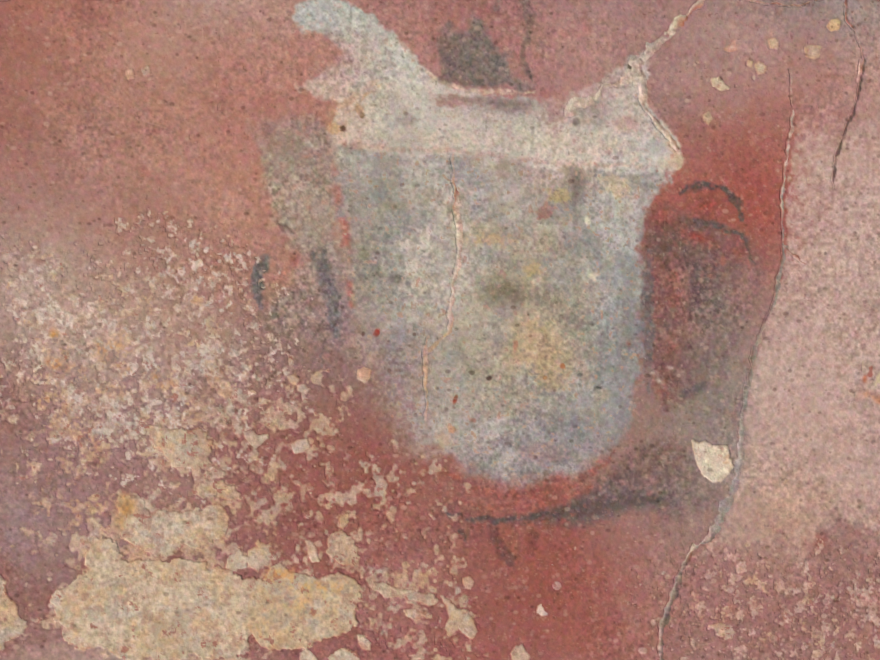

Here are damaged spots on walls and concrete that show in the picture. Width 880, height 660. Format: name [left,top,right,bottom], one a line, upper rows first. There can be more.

crack [563,0,706,152]
crack [831,0,867,189]
damp [0,231,257,408]
peeling [0,201,497,660]
flaking render [687,439,734,483]
crack [657,68,807,660]
flaking render [536,602,559,619]
peeling [605,511,880,660]